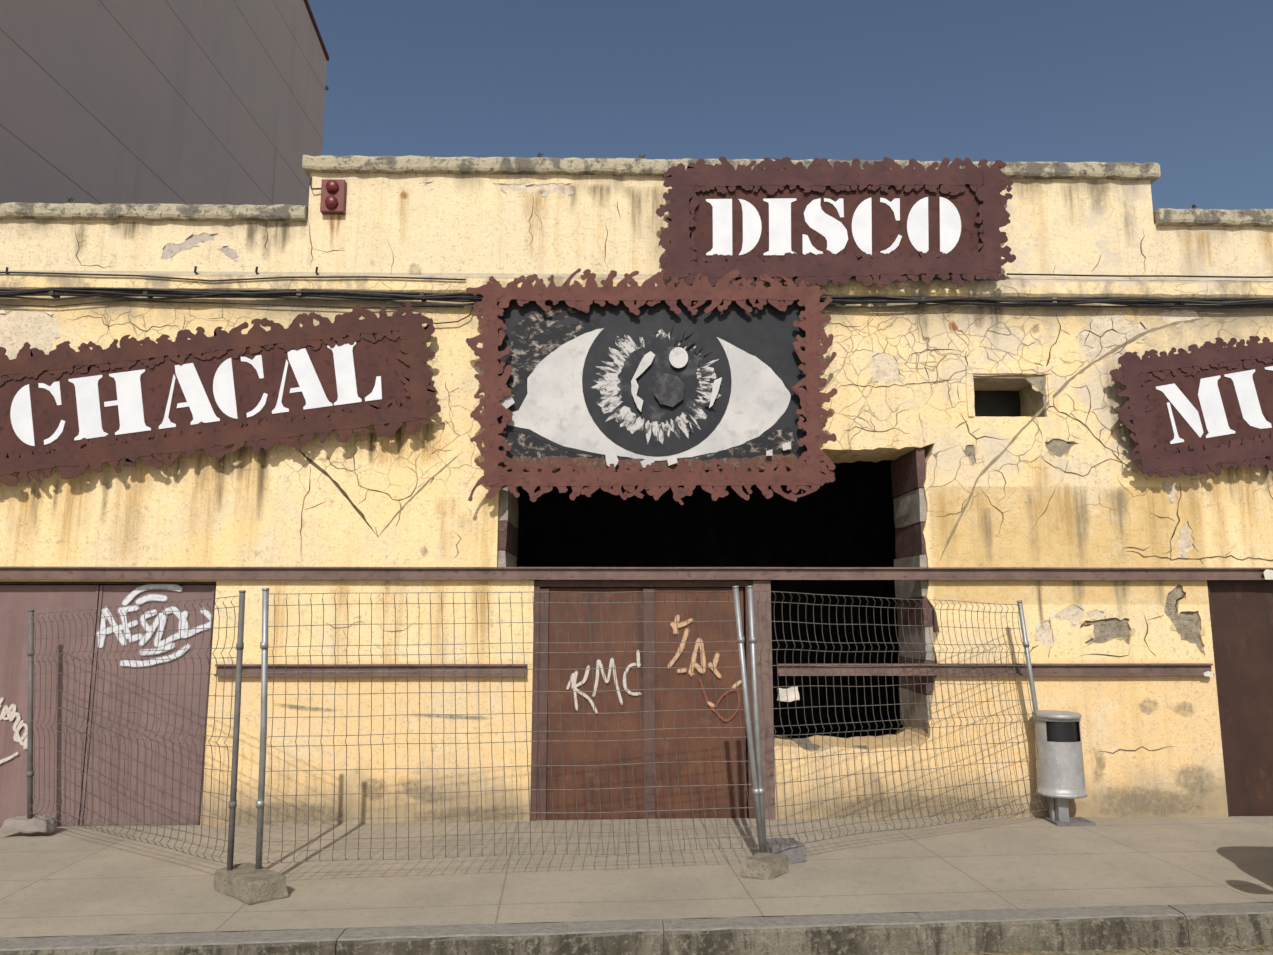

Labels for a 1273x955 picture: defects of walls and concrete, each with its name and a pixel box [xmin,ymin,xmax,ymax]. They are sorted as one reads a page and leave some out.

peeling [161,231,239,261]
water stain [258,447,266,494]
crack [299,381,461,560]
crack [838,315,1202,558]
crack [1126,486,1273,563]
spalling [1034,604,1136,649]
spalling [1162,584,1206,653]